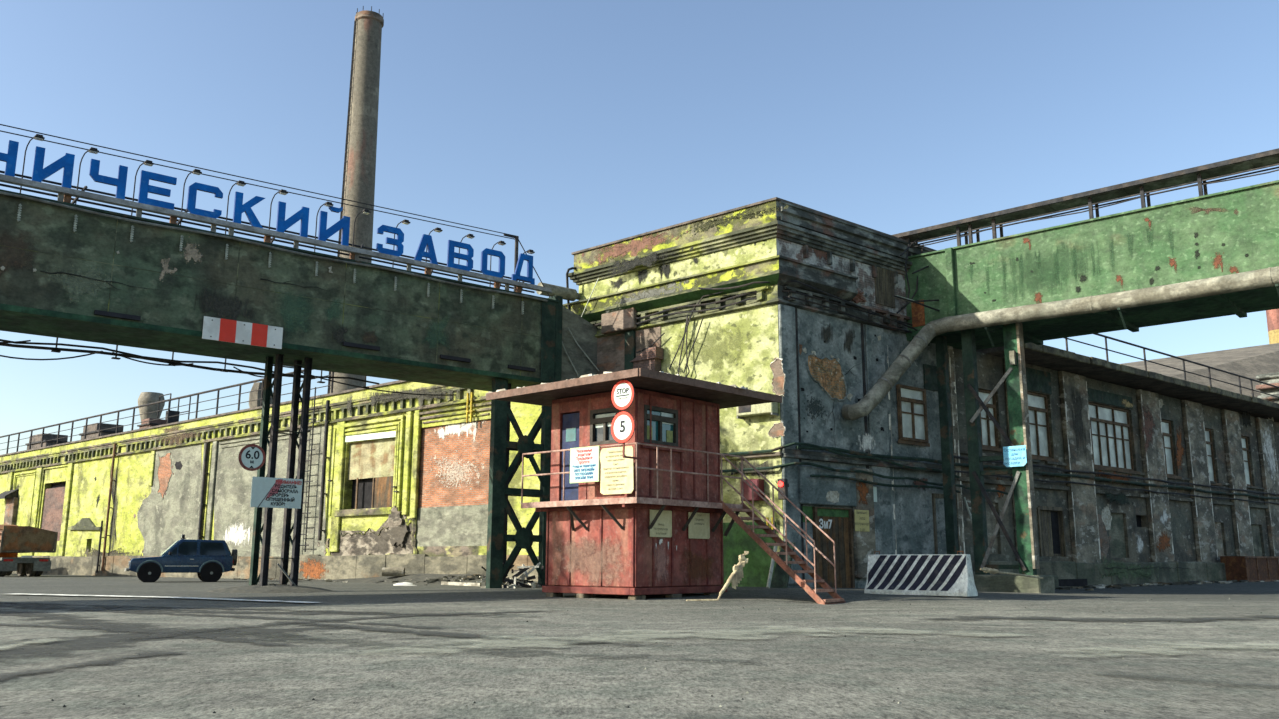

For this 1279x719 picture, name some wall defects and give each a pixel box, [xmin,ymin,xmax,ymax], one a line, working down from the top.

water stain [611,264,671,288]
rust [1211,252,1239,273]
water stain [195,289,253,320]
spalling [770,357,786,396]
spalling [799,341,860,402]
flaking render [134,420,417,557]
spalling [431,450,484,490]